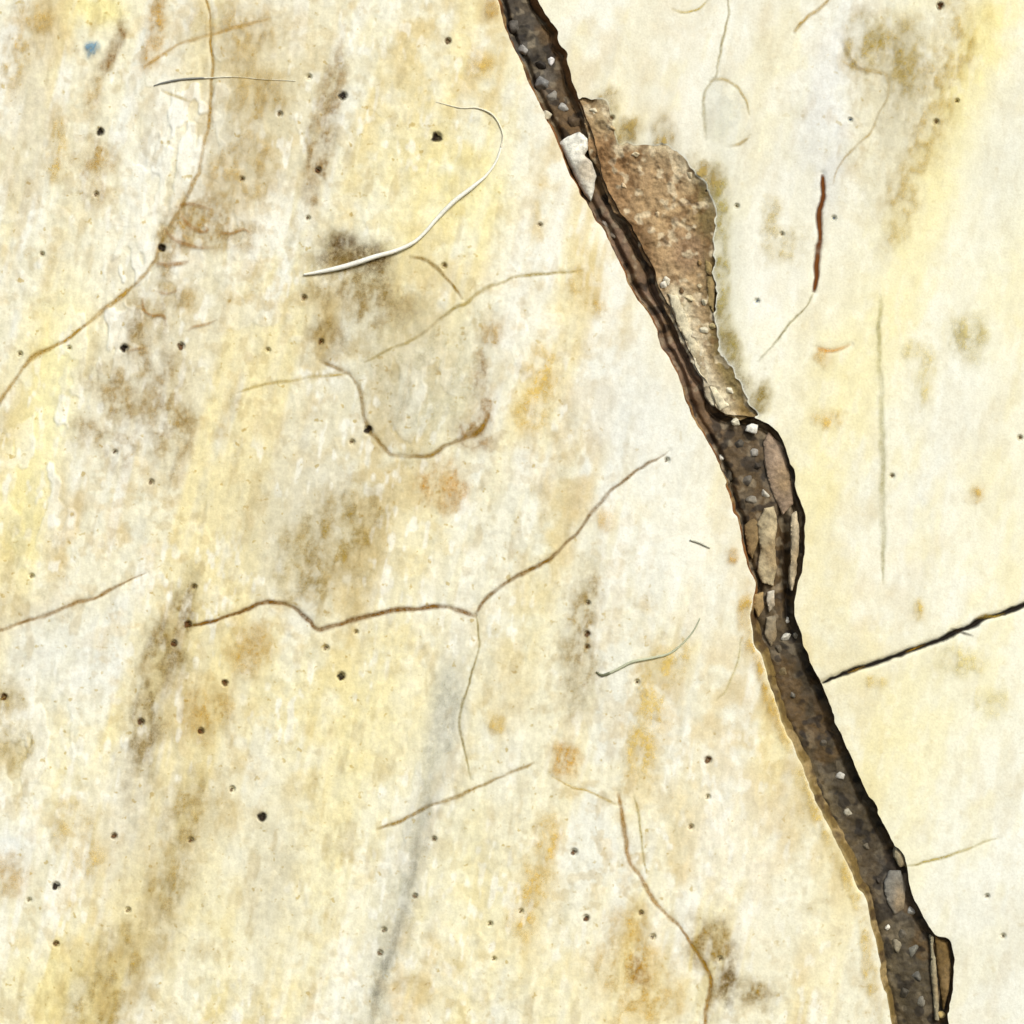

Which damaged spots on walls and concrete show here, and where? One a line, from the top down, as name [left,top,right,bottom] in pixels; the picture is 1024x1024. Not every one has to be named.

crack [207,38,215,128]
spalling [578,97,758,420]
crack [0,276,144,401]
crack [18,579,131,624]
crack [192,514,591,631]
crack [498,0,1024,1024]